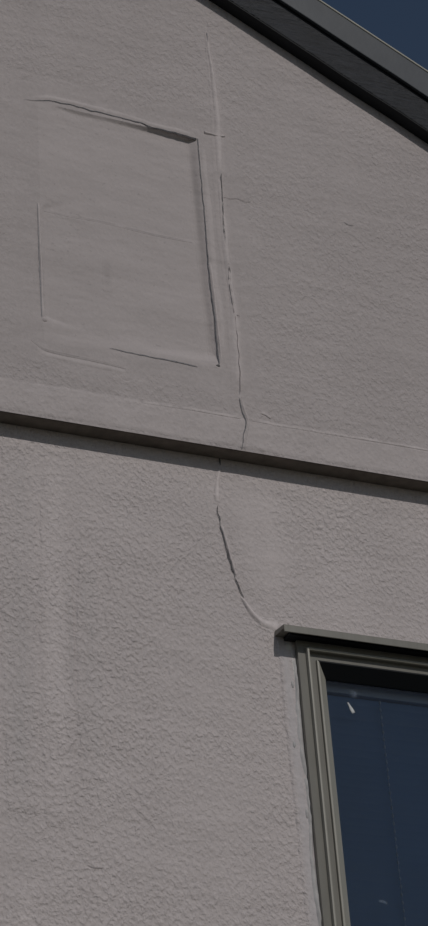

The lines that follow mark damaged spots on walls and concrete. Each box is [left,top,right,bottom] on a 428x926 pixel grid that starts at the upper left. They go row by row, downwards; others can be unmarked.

crack [26,99,220,369]
crack [239,399,250,449]
crack [214,458,278,632]